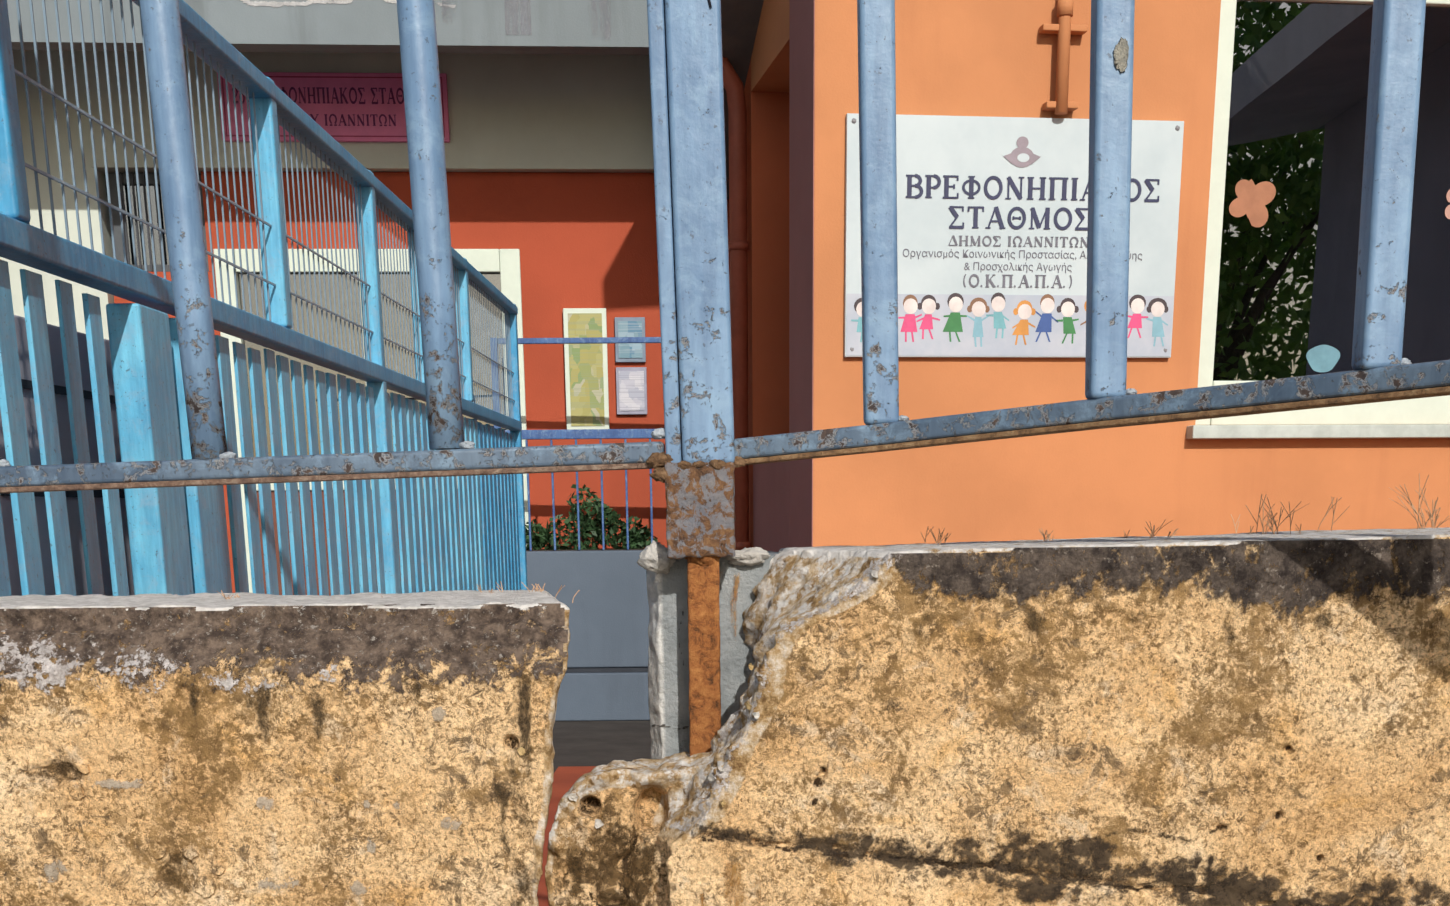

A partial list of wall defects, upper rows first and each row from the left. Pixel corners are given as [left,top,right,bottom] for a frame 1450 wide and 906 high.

rust [685,556,721,566]
water stain [890,539,1450,651]
spalling [670,553,902,834]
water stain [0,603,663,906]
crack [702,835,878,859]
crack [917,826,1276,903]